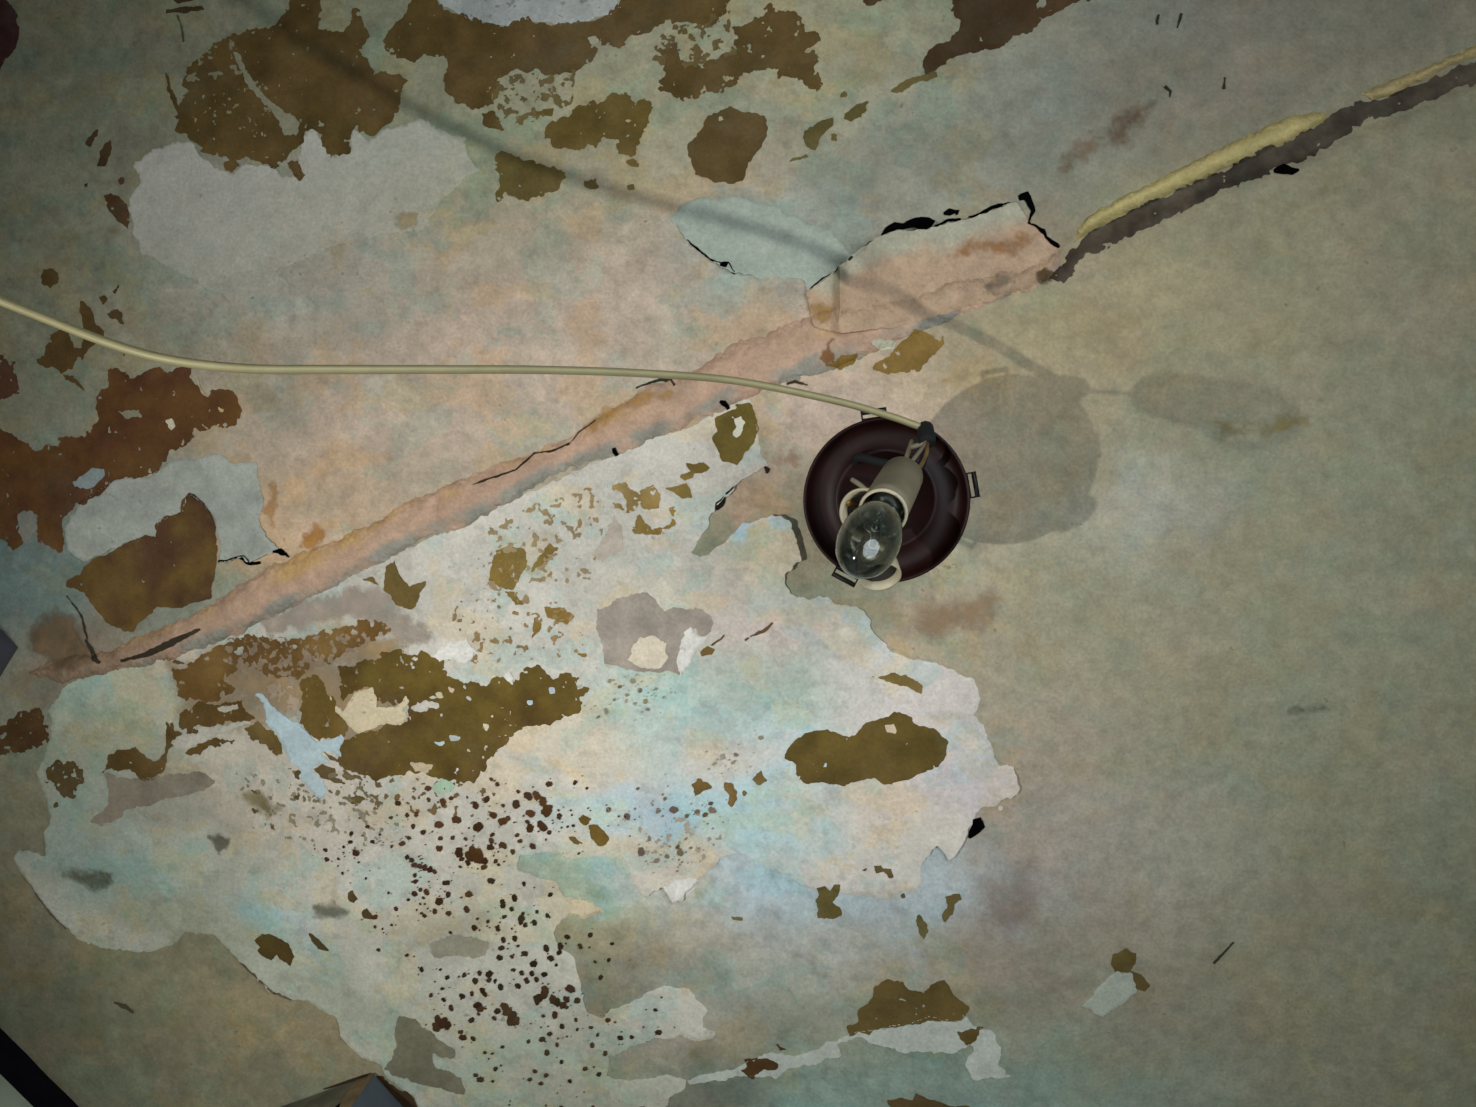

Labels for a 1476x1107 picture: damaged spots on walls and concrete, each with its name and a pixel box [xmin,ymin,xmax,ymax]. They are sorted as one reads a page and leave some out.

peeling [891,0,1090,93]
peeling [85,129,112,167]
peeling [104,0,852,321]
peeling [790,91,868,162]
crack [636,378,676,389]
peeling [0,285,279,632]
crack [473,419,596,485]
crack [66,596,200,664]
peeling [0,399,1020,1107]